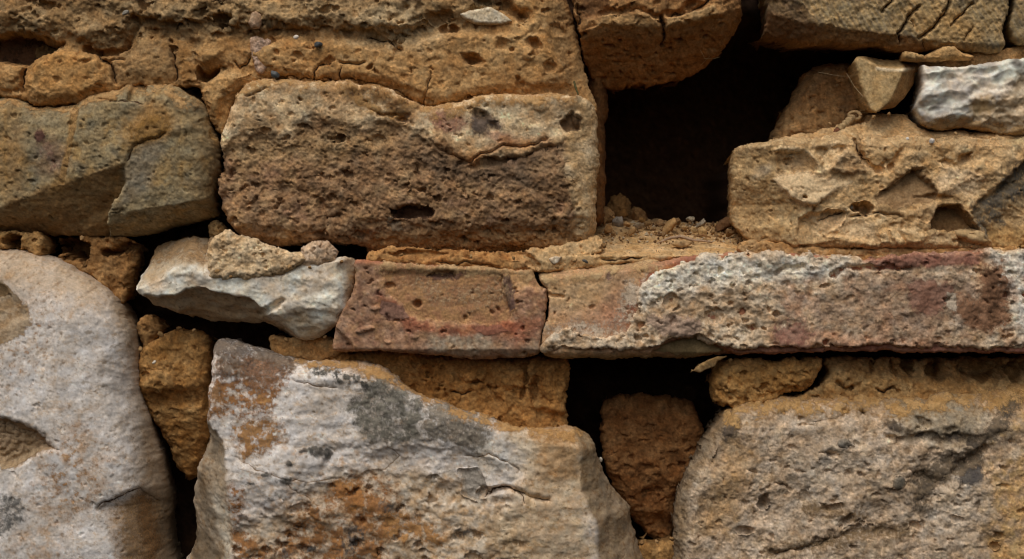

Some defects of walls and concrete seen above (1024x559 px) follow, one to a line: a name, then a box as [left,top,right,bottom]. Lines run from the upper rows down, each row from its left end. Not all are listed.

crack [882,0,972,49]
crack [445,140,545,163]
crack [464,453,543,503]